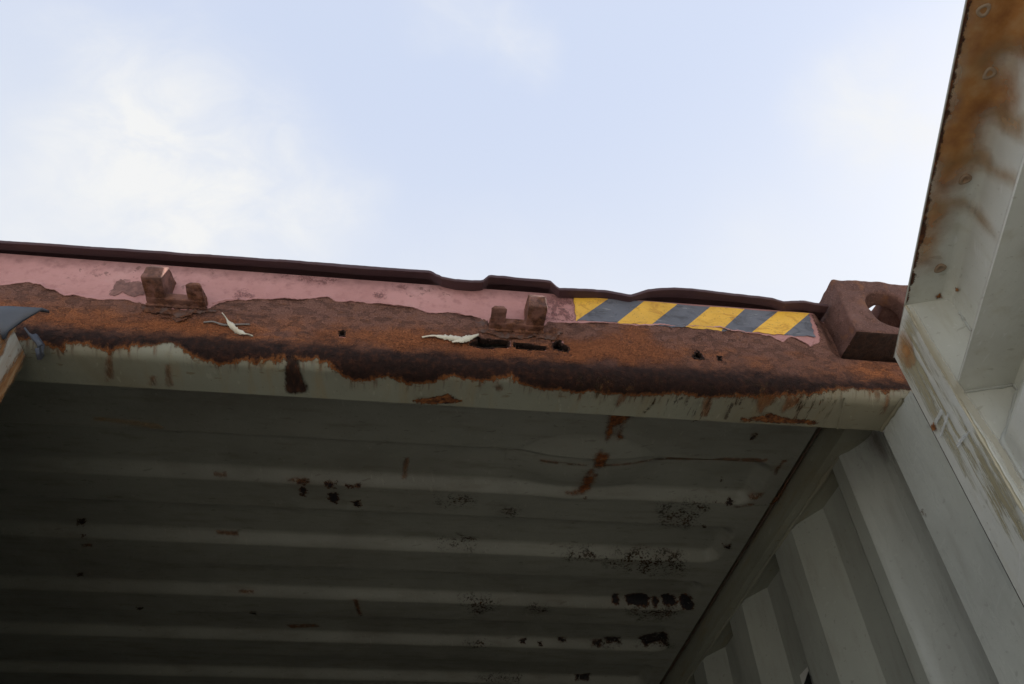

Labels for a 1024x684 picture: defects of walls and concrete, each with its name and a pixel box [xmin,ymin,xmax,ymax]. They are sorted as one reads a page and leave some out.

corrosion [906,0,1024,303]
corrosion [0,282,912,440]
corrosion [541,451,787,495]